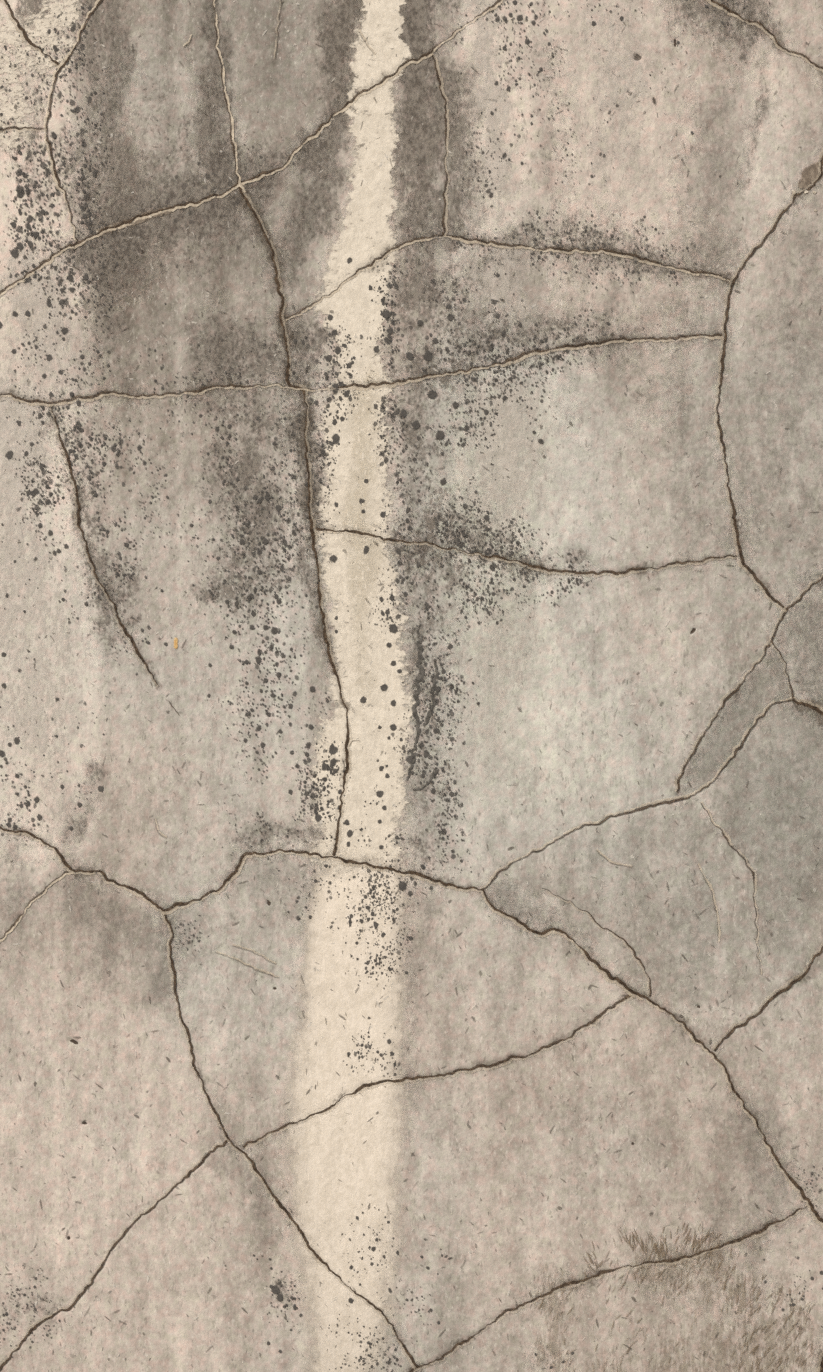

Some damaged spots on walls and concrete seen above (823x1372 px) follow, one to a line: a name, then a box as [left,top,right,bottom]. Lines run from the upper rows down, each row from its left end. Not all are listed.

water stain [640,0,774,89]
water stain [530,104,619,195]
crack [0,0,823,856]
water stain [0,736,53,845]
water stain [60,765,108,835]
crack [0,668,823,1372]